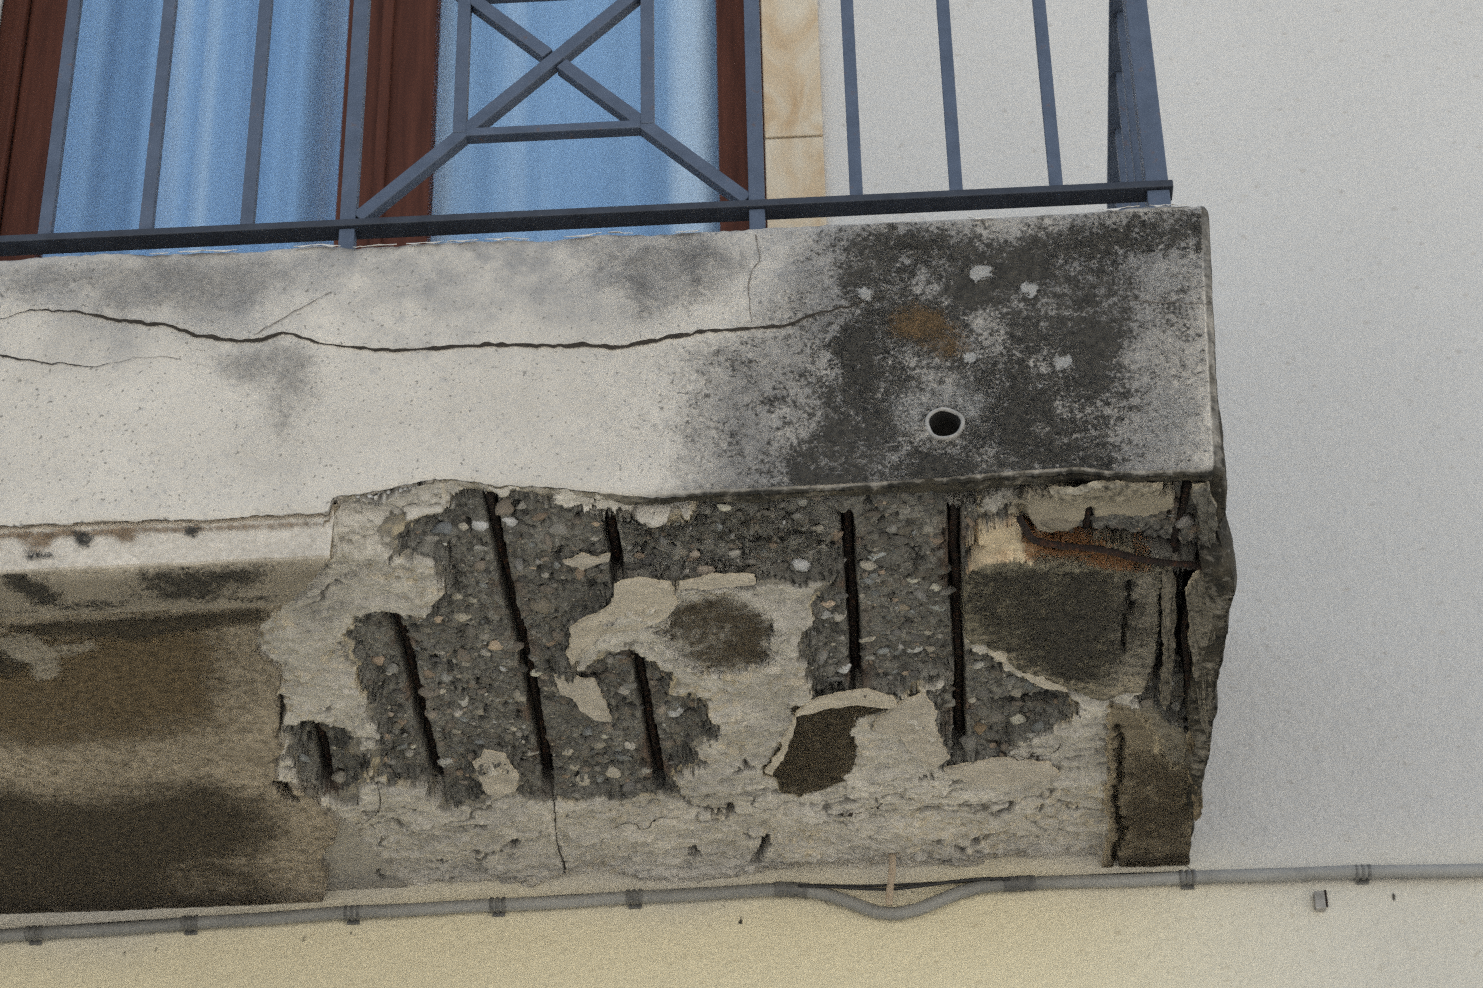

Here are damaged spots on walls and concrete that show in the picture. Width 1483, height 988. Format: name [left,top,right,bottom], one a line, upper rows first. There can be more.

crack [0,234,875,367]
water stain [660,209,1206,508]
water stain [618,505,835,557]
corrosion [1020,516,1149,572]
water stain [0,522,315,750]
water stain [656,592,775,674]
peeling [257,480,1218,891]
water stain [764,705,880,794]
mould [960,568,1157,686]
water stain [0,783,287,914]